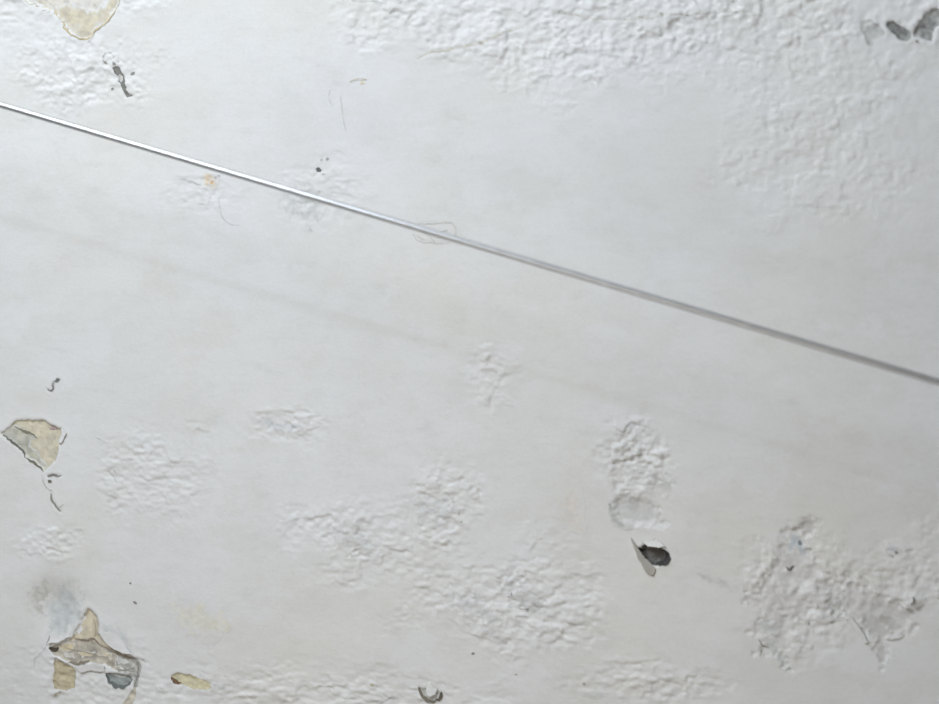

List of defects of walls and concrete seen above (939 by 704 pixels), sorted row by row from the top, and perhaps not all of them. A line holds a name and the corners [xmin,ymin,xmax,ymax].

spalling [25,0,121,42]
spalling [860,8,939,47]
spalling [0,419,67,471]
peeling [740,525,921,673]
spalling [33,608,147,704]
spalling [171,673,233,695]